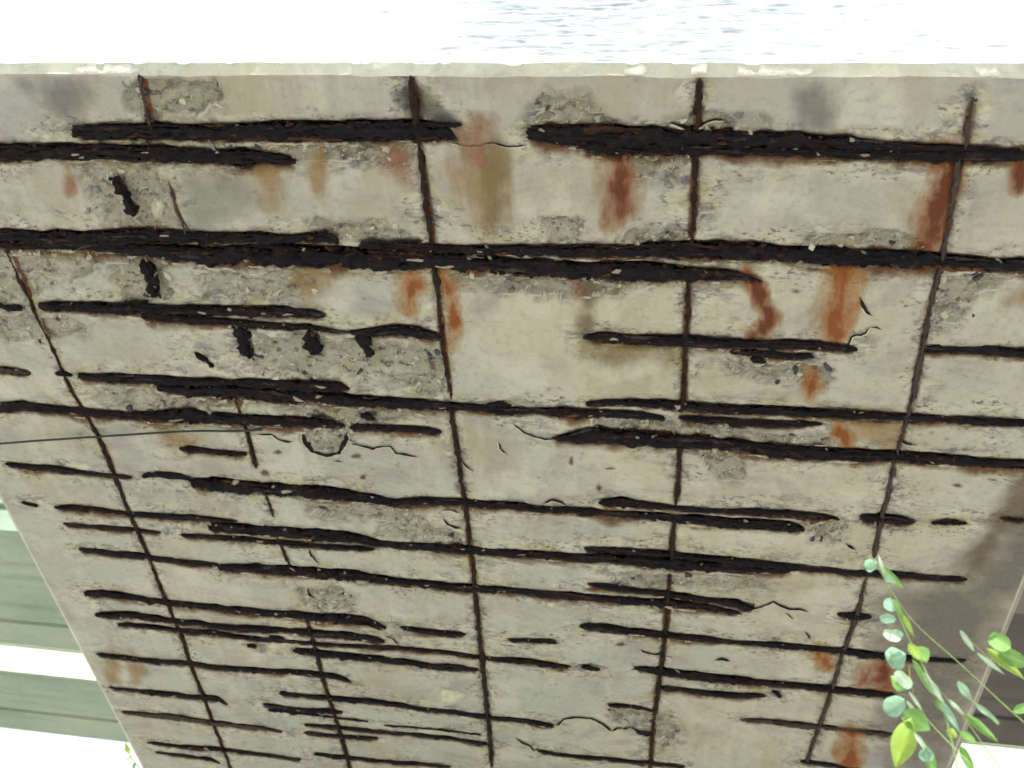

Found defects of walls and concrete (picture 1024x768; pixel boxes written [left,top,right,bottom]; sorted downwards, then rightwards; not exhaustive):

spalling [254,140,436,245]
crack [451,141,527,149]
rust [0,115,1024,475]
spalling [680,281,692,405]
crack [847,297,883,347]
spalling [872,97,993,559]
crack [256,433,418,462]
spalling [0,241,232,768]
spalling [254,267,494,768]
rust [579,623,966,700]
crack [557,717,651,737]
rust [739,718,893,768]